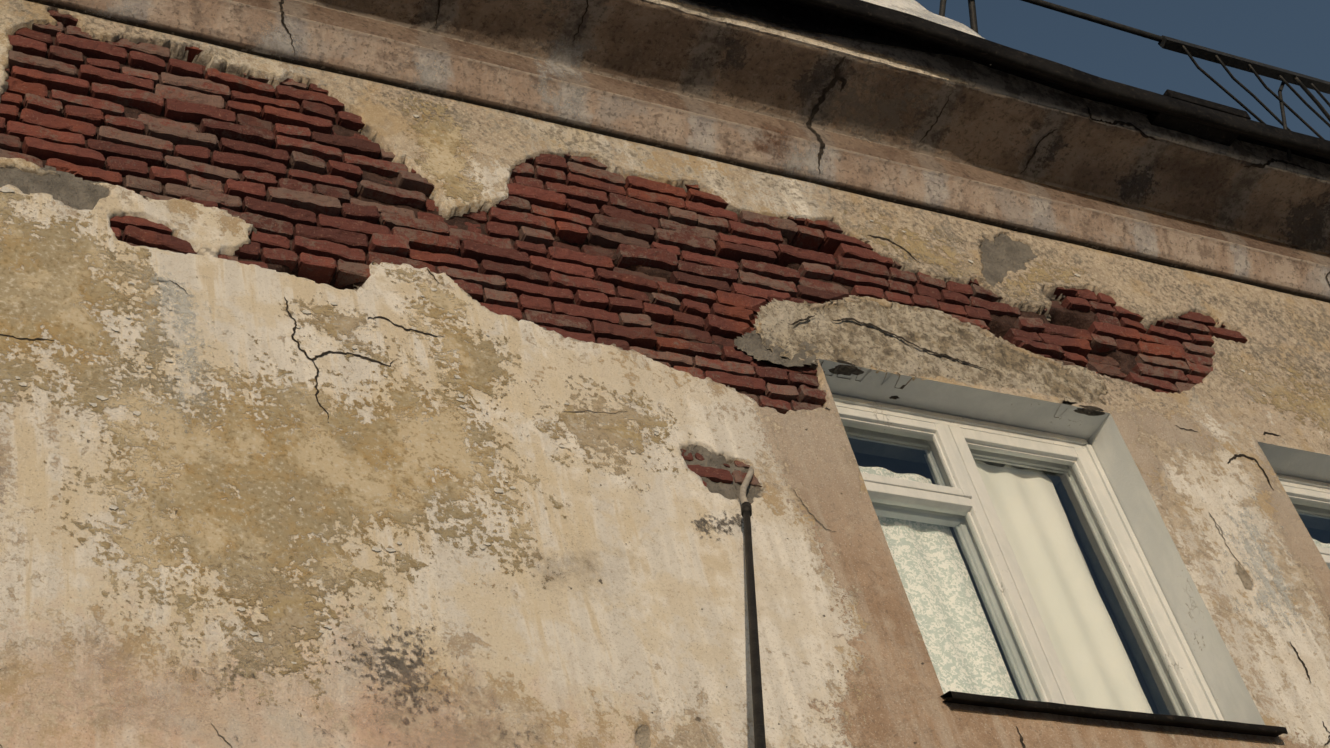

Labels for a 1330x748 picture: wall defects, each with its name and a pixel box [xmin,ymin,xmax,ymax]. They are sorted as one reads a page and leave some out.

crack [278,0,295,55]
peeling [398,90,484,204]
crack [806,56,847,174]
flaking render [110,216,197,254]
flaking render [853,214,1088,300]
crack [368,316,444,337]
crack [284,297,394,423]
peeling [532,375,762,504]
flaking render [1073,405,1105,416]
crack [1227,431,1280,490]
crack [1209,513,1251,578]
flaking render [1235,564,1252,590]